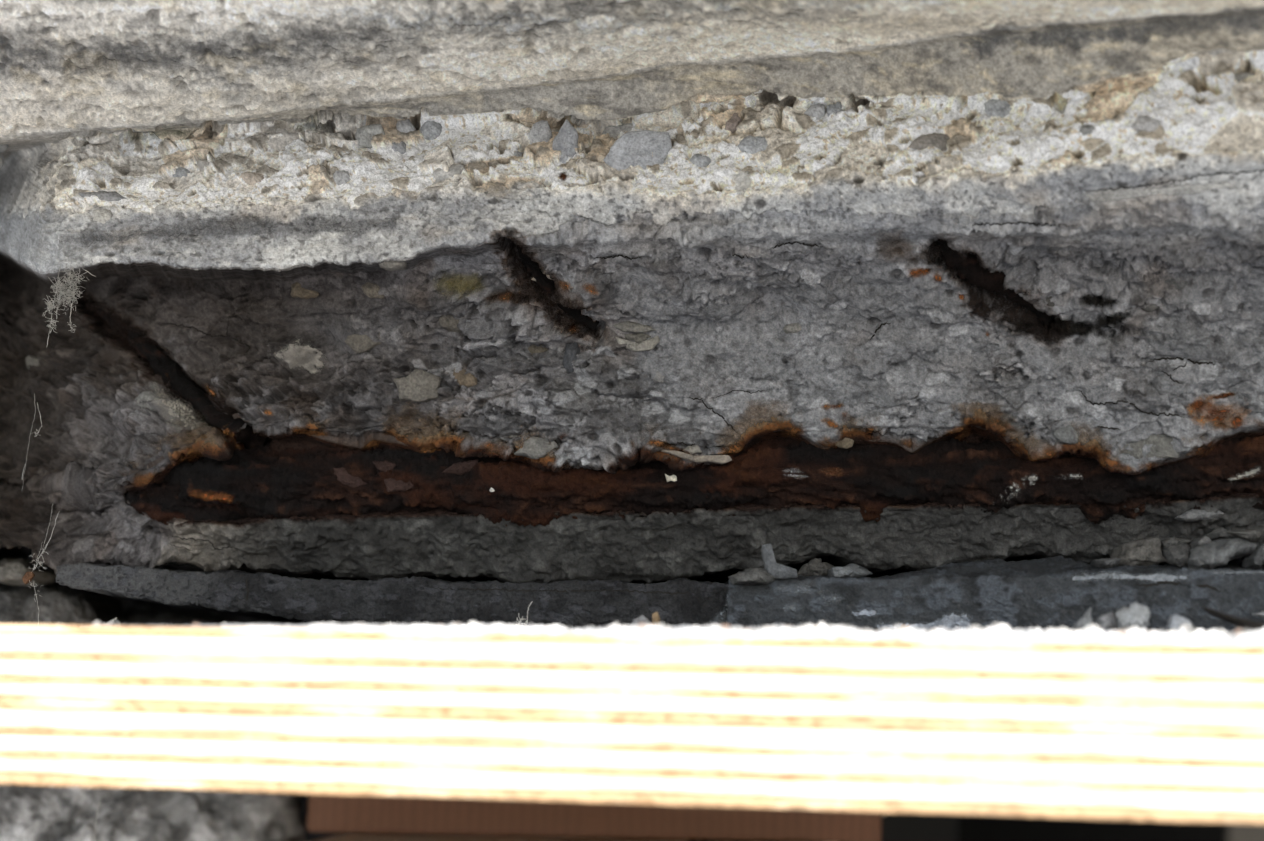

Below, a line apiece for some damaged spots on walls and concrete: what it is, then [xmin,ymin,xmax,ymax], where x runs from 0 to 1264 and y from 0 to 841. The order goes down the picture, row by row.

crack [158,320,251,356]
spalling [0,49,1264,574]
rust [67,288,913,492]
rust [932,393,1264,476]
rust [196,493,232,502]
rust [168,508,484,527]
crack [157,534,334,612]
crack [1135,581,1220,592]